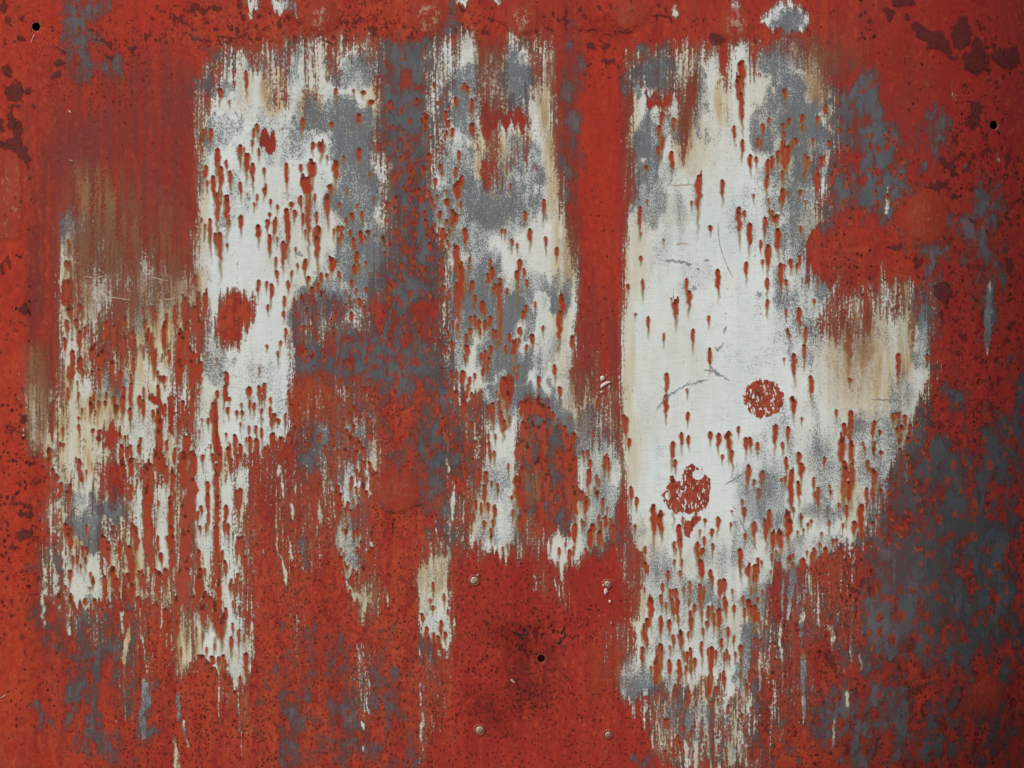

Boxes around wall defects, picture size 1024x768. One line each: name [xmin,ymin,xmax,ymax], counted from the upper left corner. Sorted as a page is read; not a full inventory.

corrosion [217,70,248,105]
corrosion [644,111,676,174]
corrosion [690,170,713,233]
corrosion [732,60,914,316]
peeling [8,32,398,768]
corrosion [44,83,616,706]
corrosion [670,278,692,324]
peeling [413,0,951,768]
corrosion [783,275,819,401]
corrosion [834,330,853,365]
corrosion [622,378,928,765]